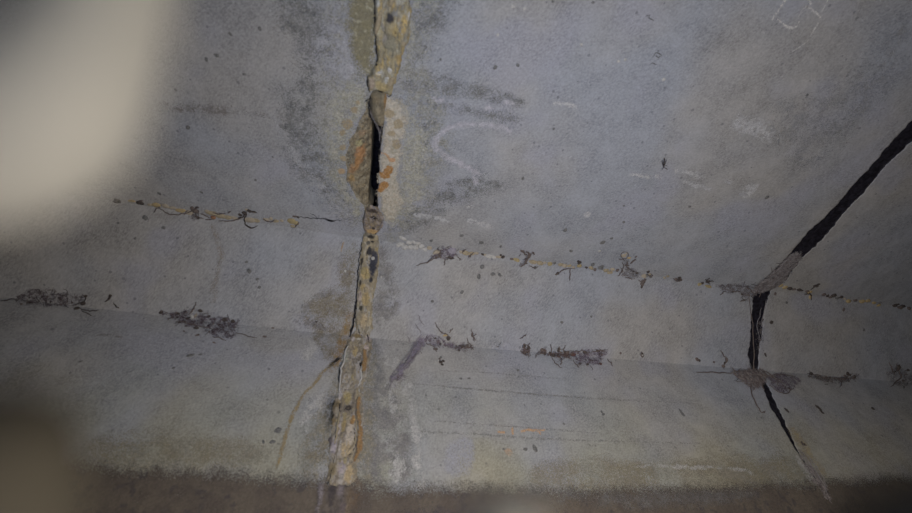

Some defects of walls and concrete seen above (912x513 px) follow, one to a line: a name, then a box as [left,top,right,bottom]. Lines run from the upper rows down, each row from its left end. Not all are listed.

rust [377,153,395,193]
damp [269,0,525,235]
rust [276,313,355,468]
damp [87,223,912,513]